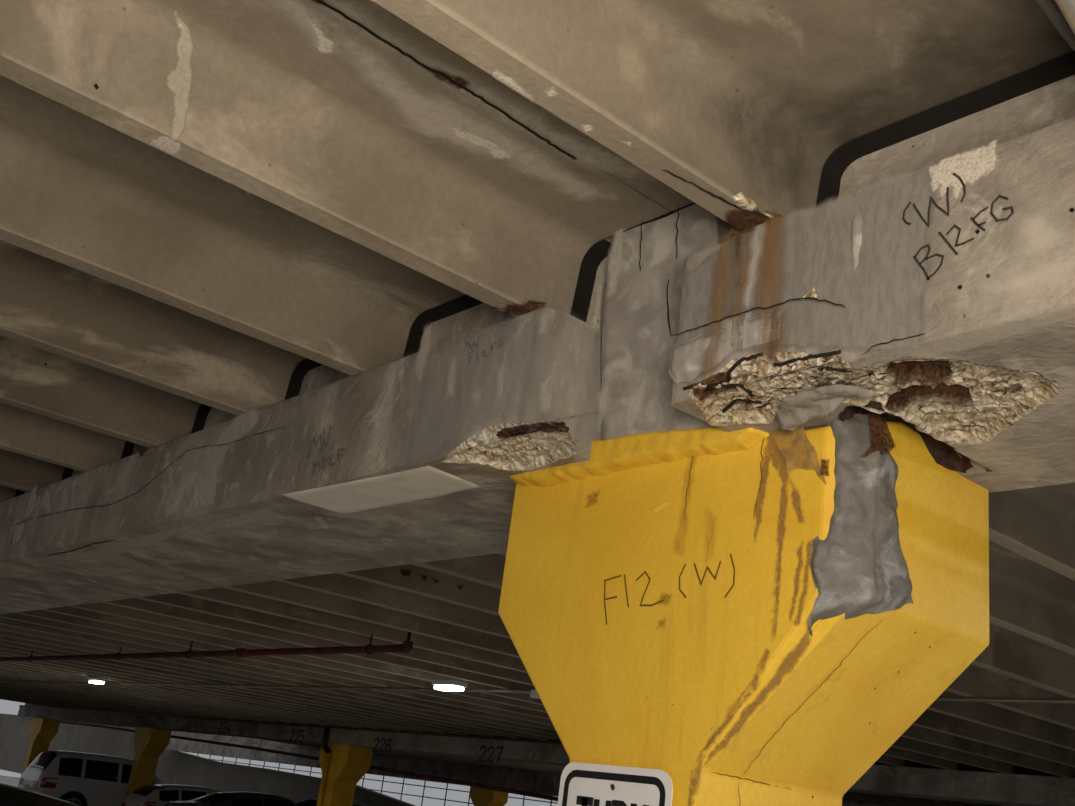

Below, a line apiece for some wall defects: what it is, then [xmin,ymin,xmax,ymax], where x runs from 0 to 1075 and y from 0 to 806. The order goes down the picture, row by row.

crack [313,0,577,160]
water stain [271,0,653,198]
corrosion [713,215,782,359]
crack [49,540,115,556]
crack [6,426,286,528]
spalling [441,421,578,471]
corrosion [820,459,829,476]
spalling [683,350,1060,633]
corrosion [861,413,895,457]
peeling [688,542,812,806]